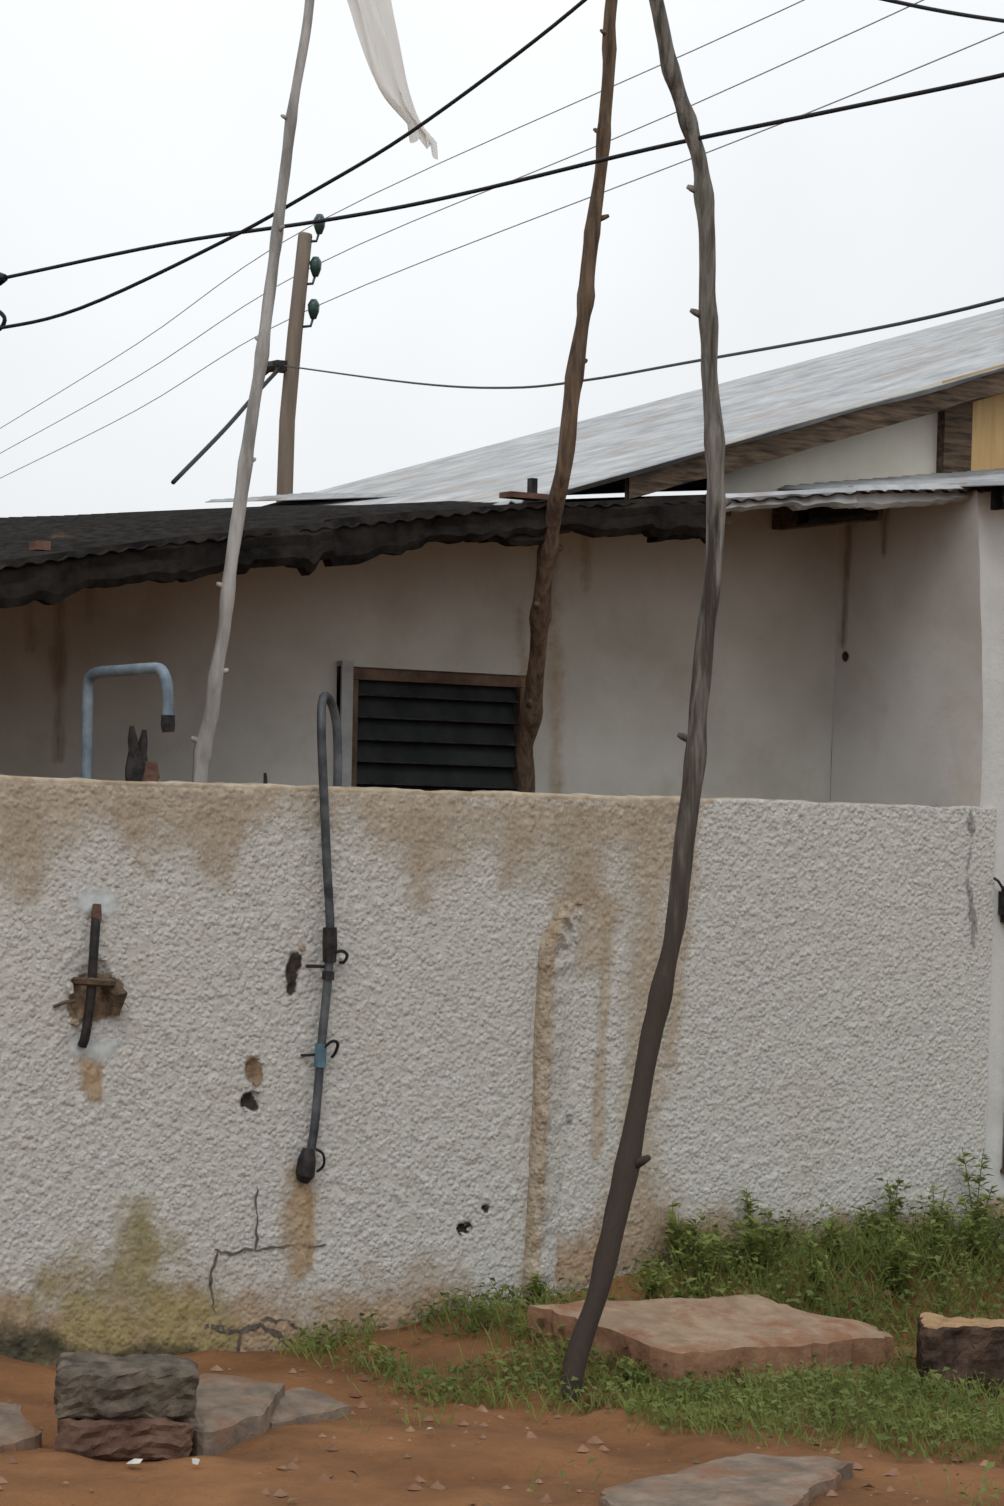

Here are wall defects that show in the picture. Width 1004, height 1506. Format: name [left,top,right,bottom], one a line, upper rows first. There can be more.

leakage [0,782,282,840]
leakage [314,792,674,1076]
leakage [668,933,686,1063]
corrosion [82,1056,101,1103]
leakage [627,1135,648,1247]
crack [204,1187,327,1352]
leakage [0,1327,73,1364]
leakage [107,1344,194,1357]